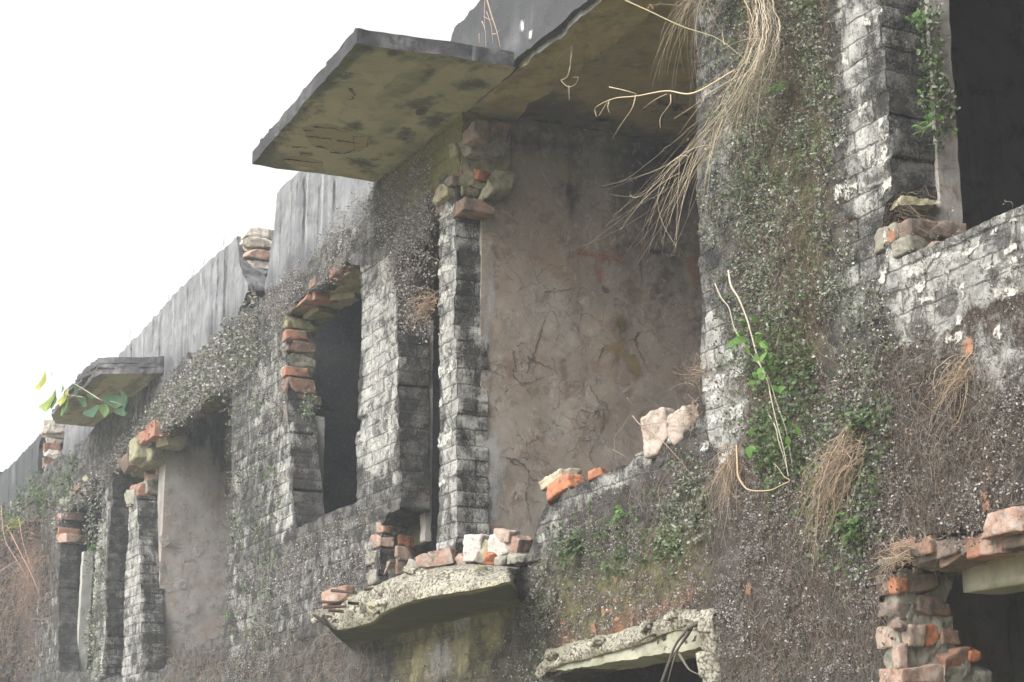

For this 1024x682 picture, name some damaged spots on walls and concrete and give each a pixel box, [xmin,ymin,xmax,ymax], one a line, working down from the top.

crack [488,287,593,398]
crack [581,329,653,466]
crack [499,448,538,524]
spalling [310,515,533,630]
spalling [535,575,723,682]